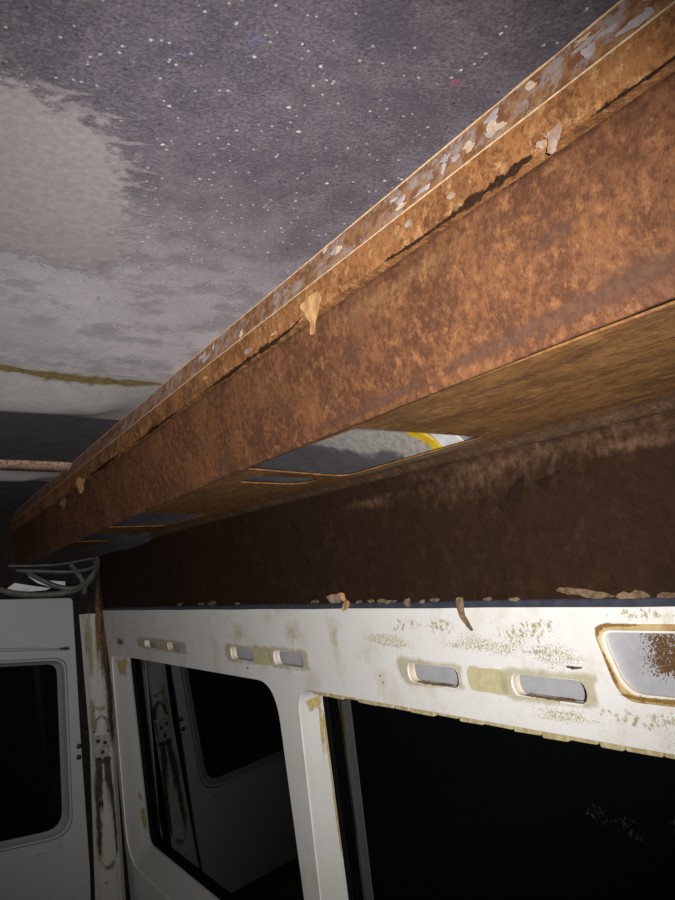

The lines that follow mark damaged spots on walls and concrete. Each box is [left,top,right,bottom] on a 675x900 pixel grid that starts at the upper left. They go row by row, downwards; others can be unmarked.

peeling [483,108,507,138]
damp [0,72,154,271]
crack [384,155,533,262]
peeling [300,292,321,335]
crack [204,315,304,392]
rust [571,414,668,451]
peeling [311,593,440,611]
peeling [456,597,473,631]
peeling [556,587,675,599]
rust [596,609,675,681]
rust [603,653,675,705]
rust [526,694,640,727]